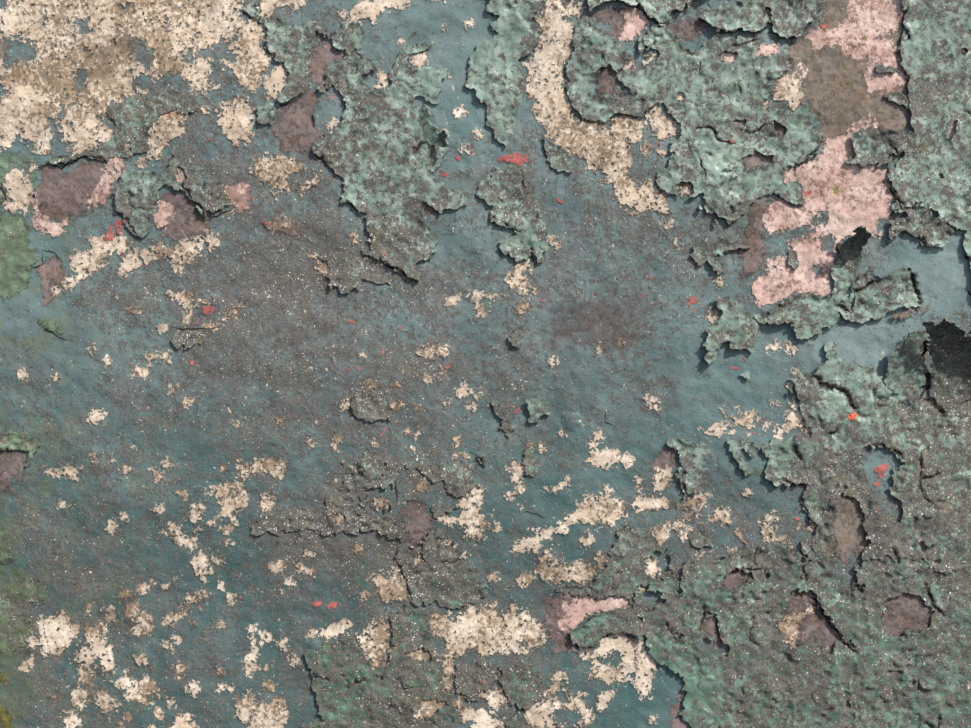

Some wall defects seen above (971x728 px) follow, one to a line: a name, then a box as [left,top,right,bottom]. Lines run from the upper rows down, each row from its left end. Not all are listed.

peeling [0,0,971,365]
crack [815,376,857,410]
crack [920,340,946,414]
crack [874,443,938,501]
crack [785,481,815,525]
peeling [0,339,971,728]
crack [732,551,768,575]
crack [802,558,856,651]
crack [925,584,944,615]